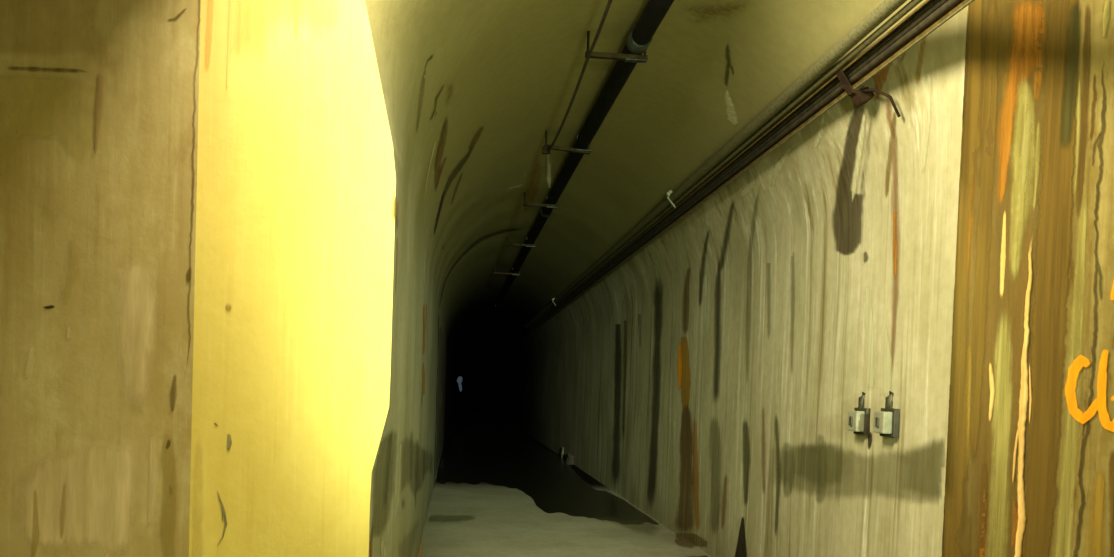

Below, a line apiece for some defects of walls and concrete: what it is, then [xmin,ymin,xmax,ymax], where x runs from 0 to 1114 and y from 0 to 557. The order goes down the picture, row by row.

rust [435,120,448,189]
damp [699,181,755,397]
damp [833,104,867,262]
rust [873,63,899,363]
rust [942,0,1090,557]
crack [1074,72,1106,557]
rust [673,408,707,547]
damp [743,412,780,531]
rust [1089,453,1114,557]